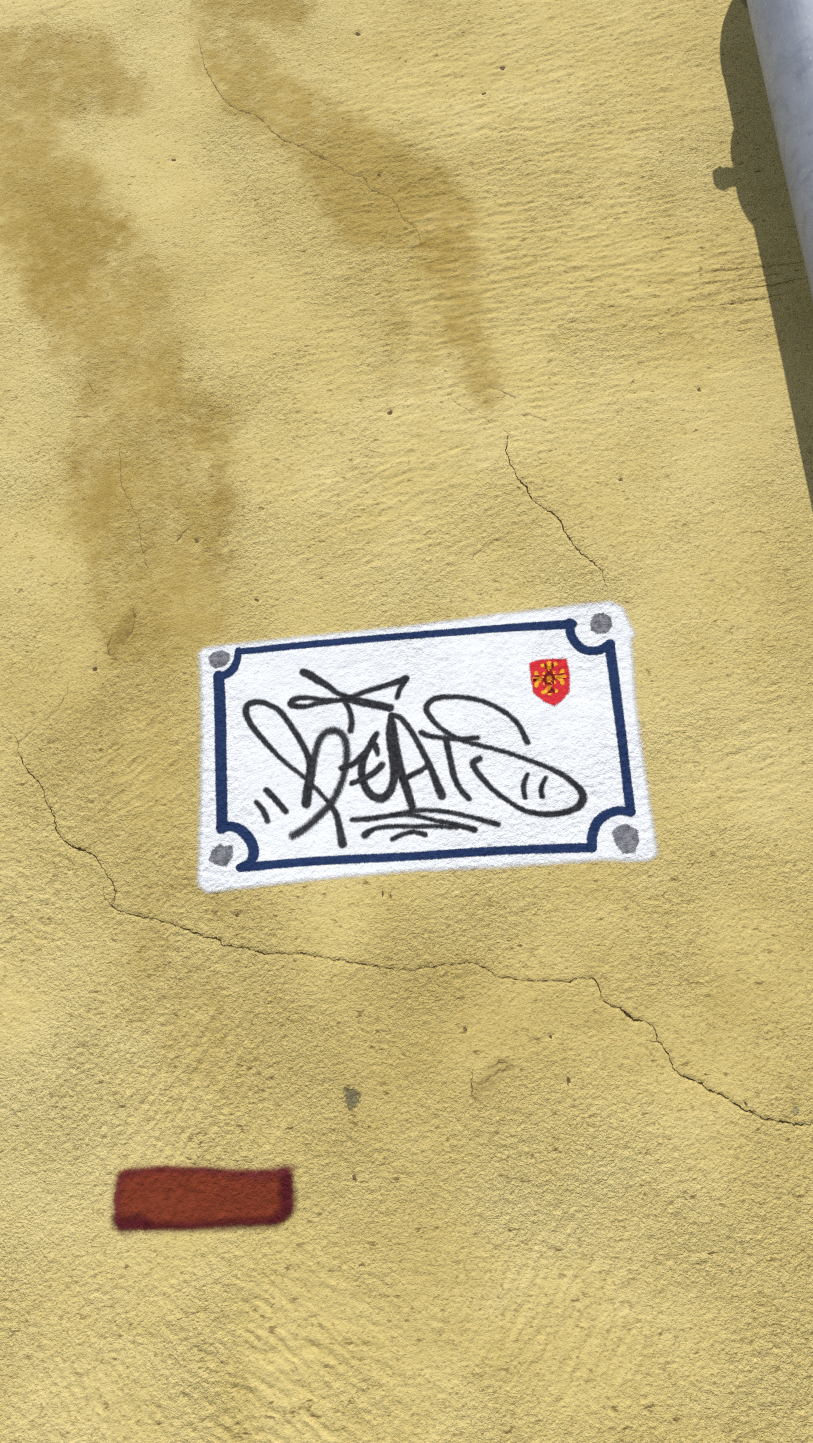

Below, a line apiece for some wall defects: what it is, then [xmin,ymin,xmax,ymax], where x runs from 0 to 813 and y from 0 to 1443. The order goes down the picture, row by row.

crack [457,386,607,586]
crack [5,688,813,1126]